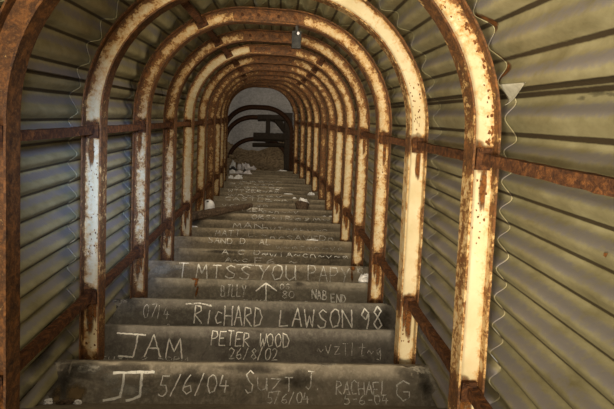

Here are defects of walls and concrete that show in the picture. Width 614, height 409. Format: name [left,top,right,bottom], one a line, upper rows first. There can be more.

rust [88,119,100,166]
rust [478,170,487,209]
rust [402,294,415,338]